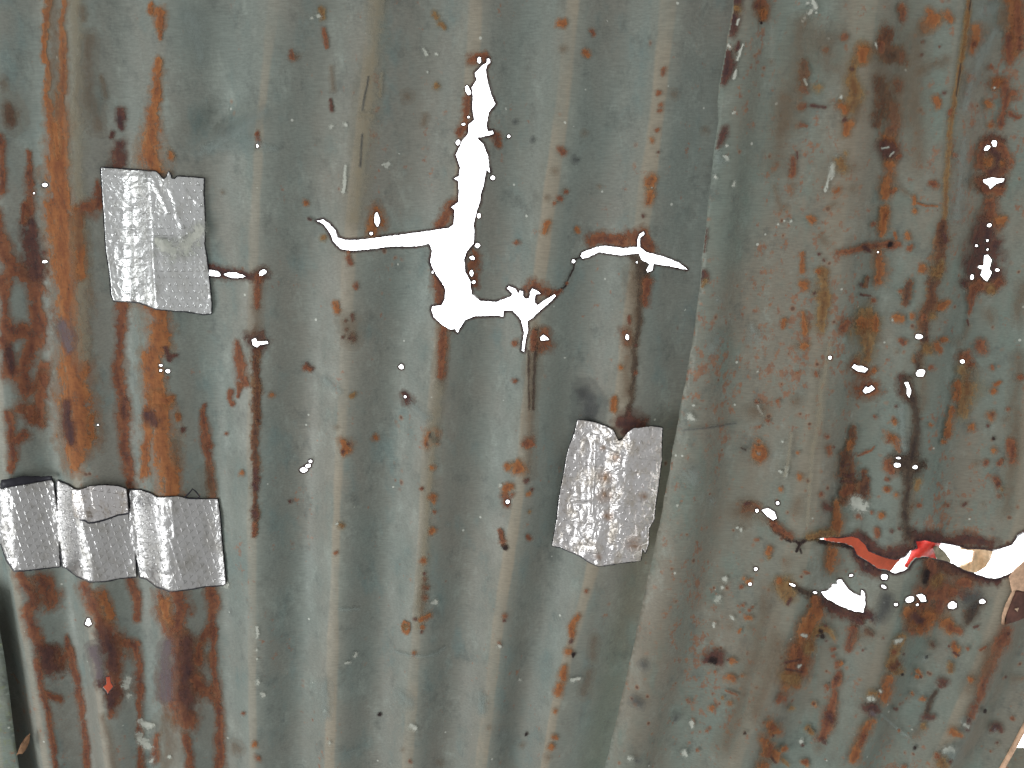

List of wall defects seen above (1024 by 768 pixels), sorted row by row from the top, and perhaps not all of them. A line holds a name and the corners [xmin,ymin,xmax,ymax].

rust [109,56,174,174]
rust [0,0,103,475]
rust [111,302,186,496]
rust [227,330,274,538]
crack [475,227,689,353]
rust [610,255,653,436]
rust [796,0,1024,577]
crack [770,522,868,554]
rust [15,572,90,768]
rust [78,580,160,768]
rust [127,578,225,768]
rust [756,558,1014,768]